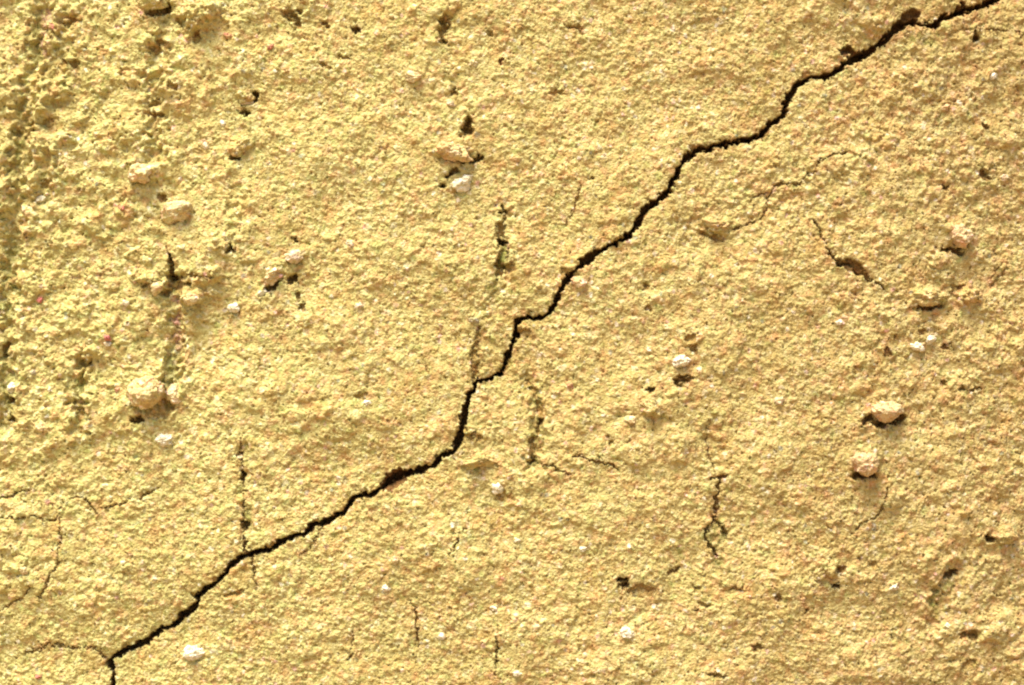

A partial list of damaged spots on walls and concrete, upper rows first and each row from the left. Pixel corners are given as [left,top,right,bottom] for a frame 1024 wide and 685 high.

crack [948,25,1020,35]
crack [408,0,999,477]
crack [166,247,178,281]
crack [986,263,1008,288]
crack [236,438,250,532]
crack [704,419,728,557]
crack [851,487,888,534]
crack [106,467,412,685]
crack [410,603,420,648]
crack [25,642,107,659]
crack [493,625,501,675]